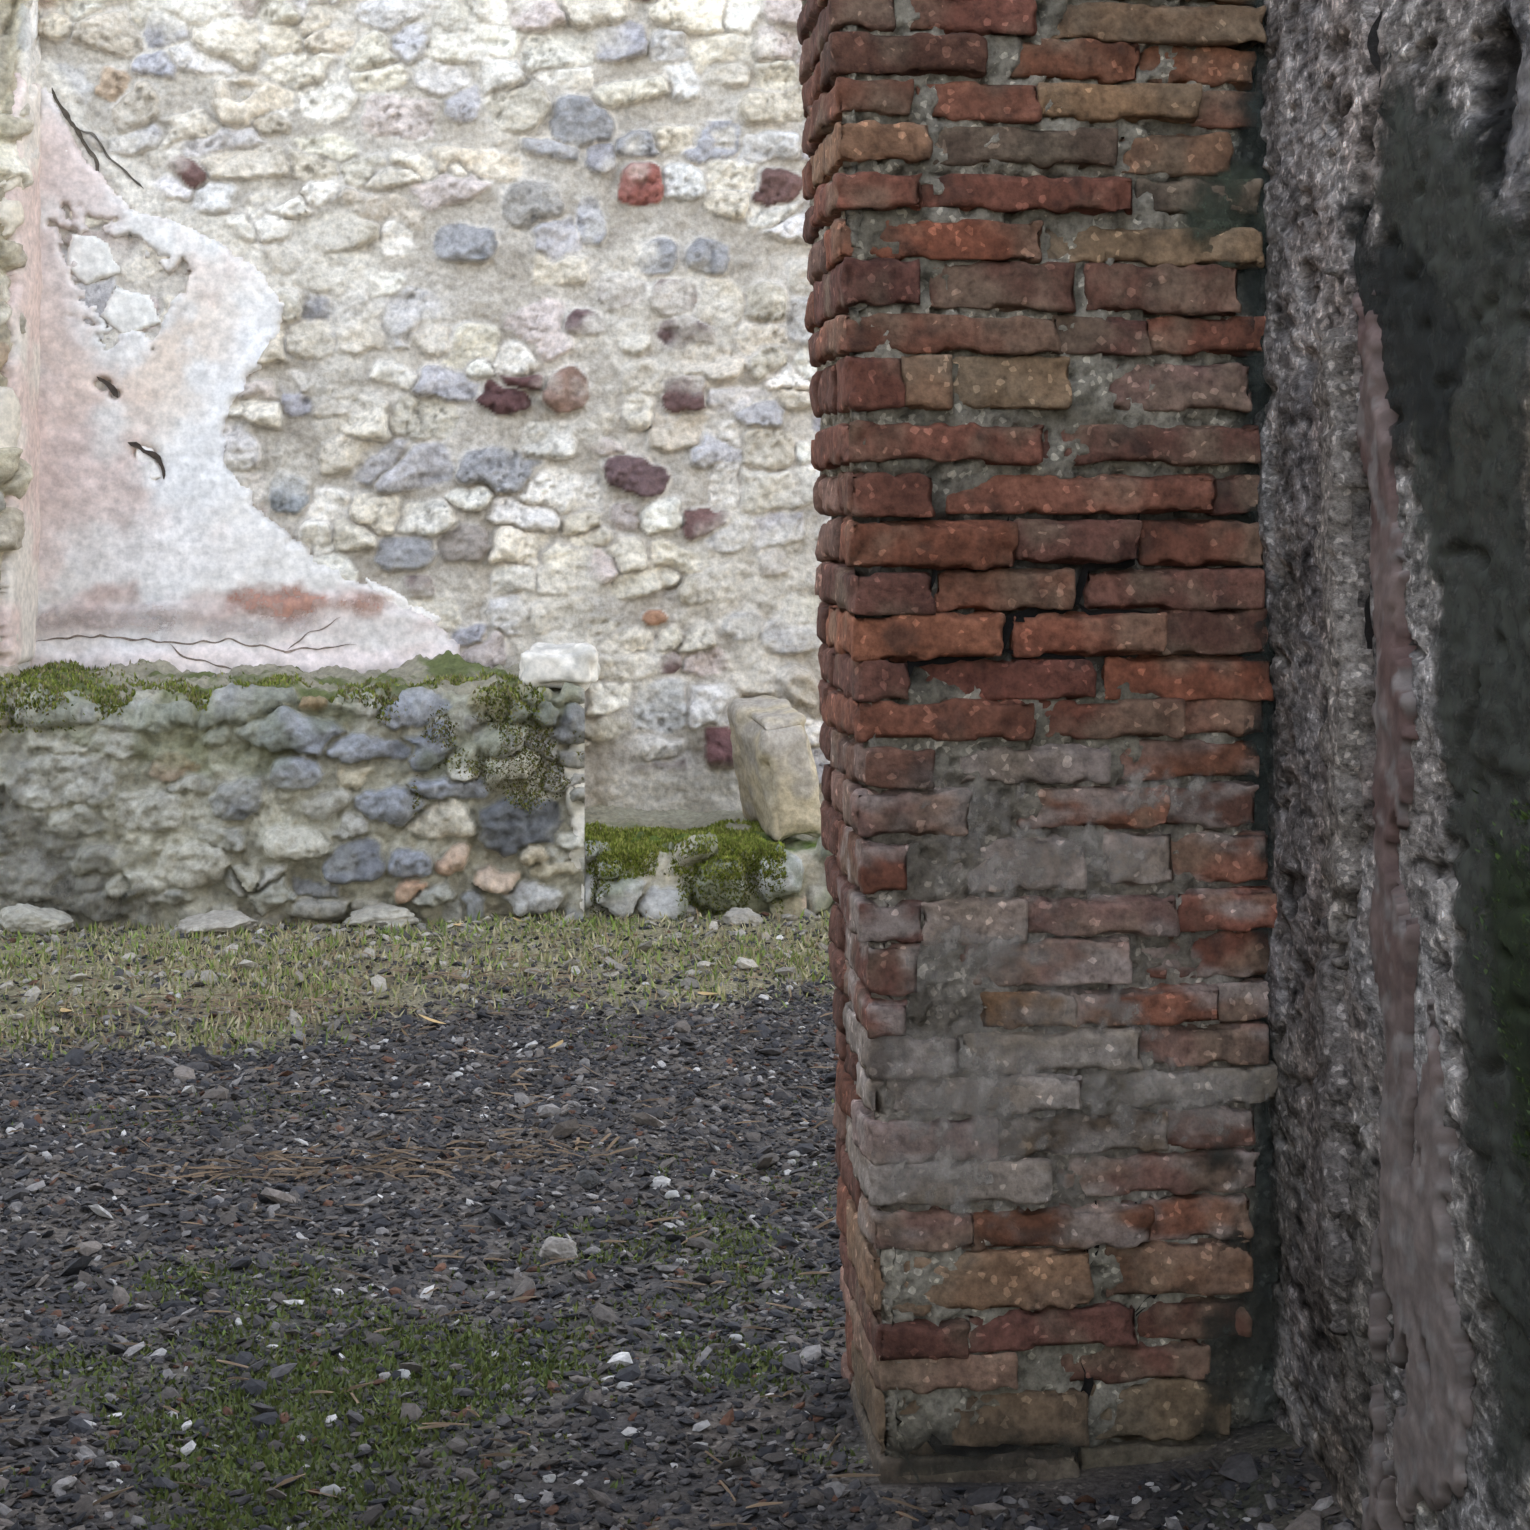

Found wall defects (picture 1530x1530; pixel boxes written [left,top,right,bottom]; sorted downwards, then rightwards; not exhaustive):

crack [1367,11,1415,175]
flaking render [0,73,460,674]
crack [1364,573,1374,649]